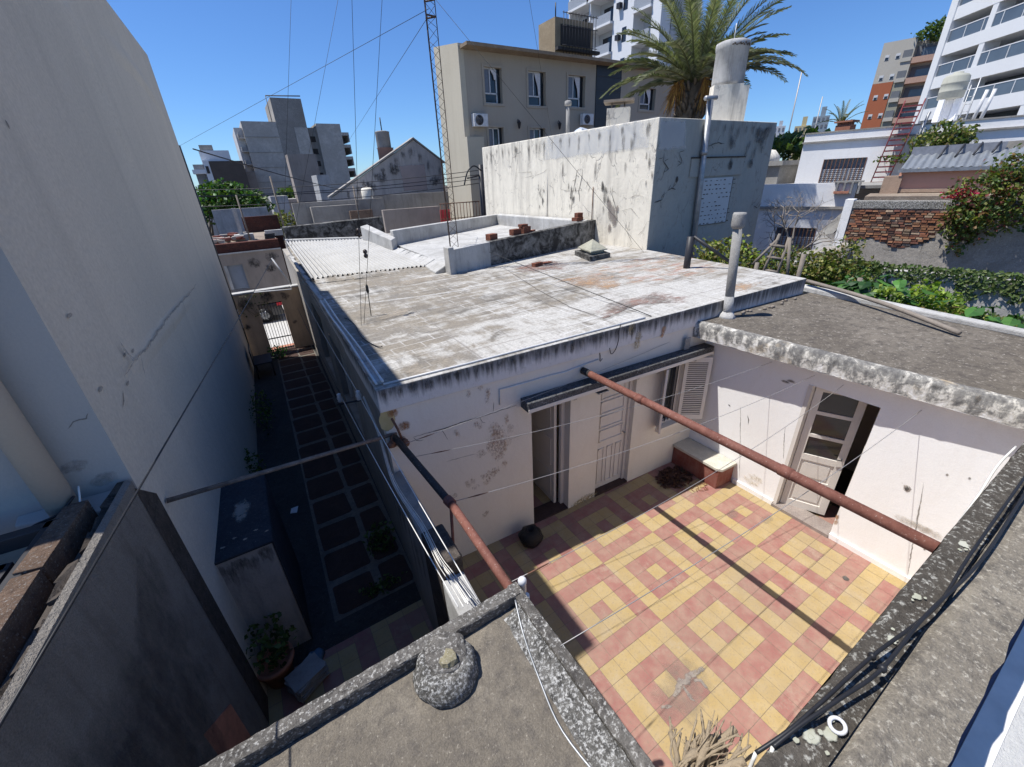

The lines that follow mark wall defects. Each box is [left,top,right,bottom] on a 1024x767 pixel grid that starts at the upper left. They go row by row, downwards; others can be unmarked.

crack [121,284,196,405]
crack [908,490,923,571]